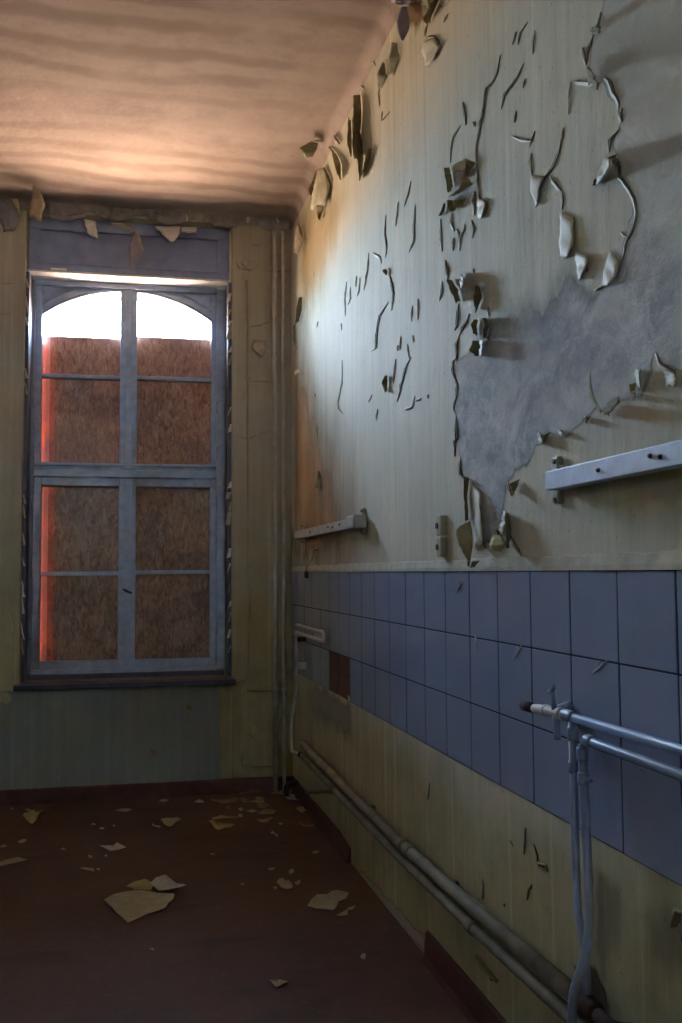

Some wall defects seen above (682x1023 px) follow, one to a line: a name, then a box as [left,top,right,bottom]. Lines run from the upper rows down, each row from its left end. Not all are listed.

peeling [391,0,451,68]
peeling [300,95,372,220]
peeling [28,186,98,239]
peeling [155,214,197,242]
peeling [438,0,682,568]